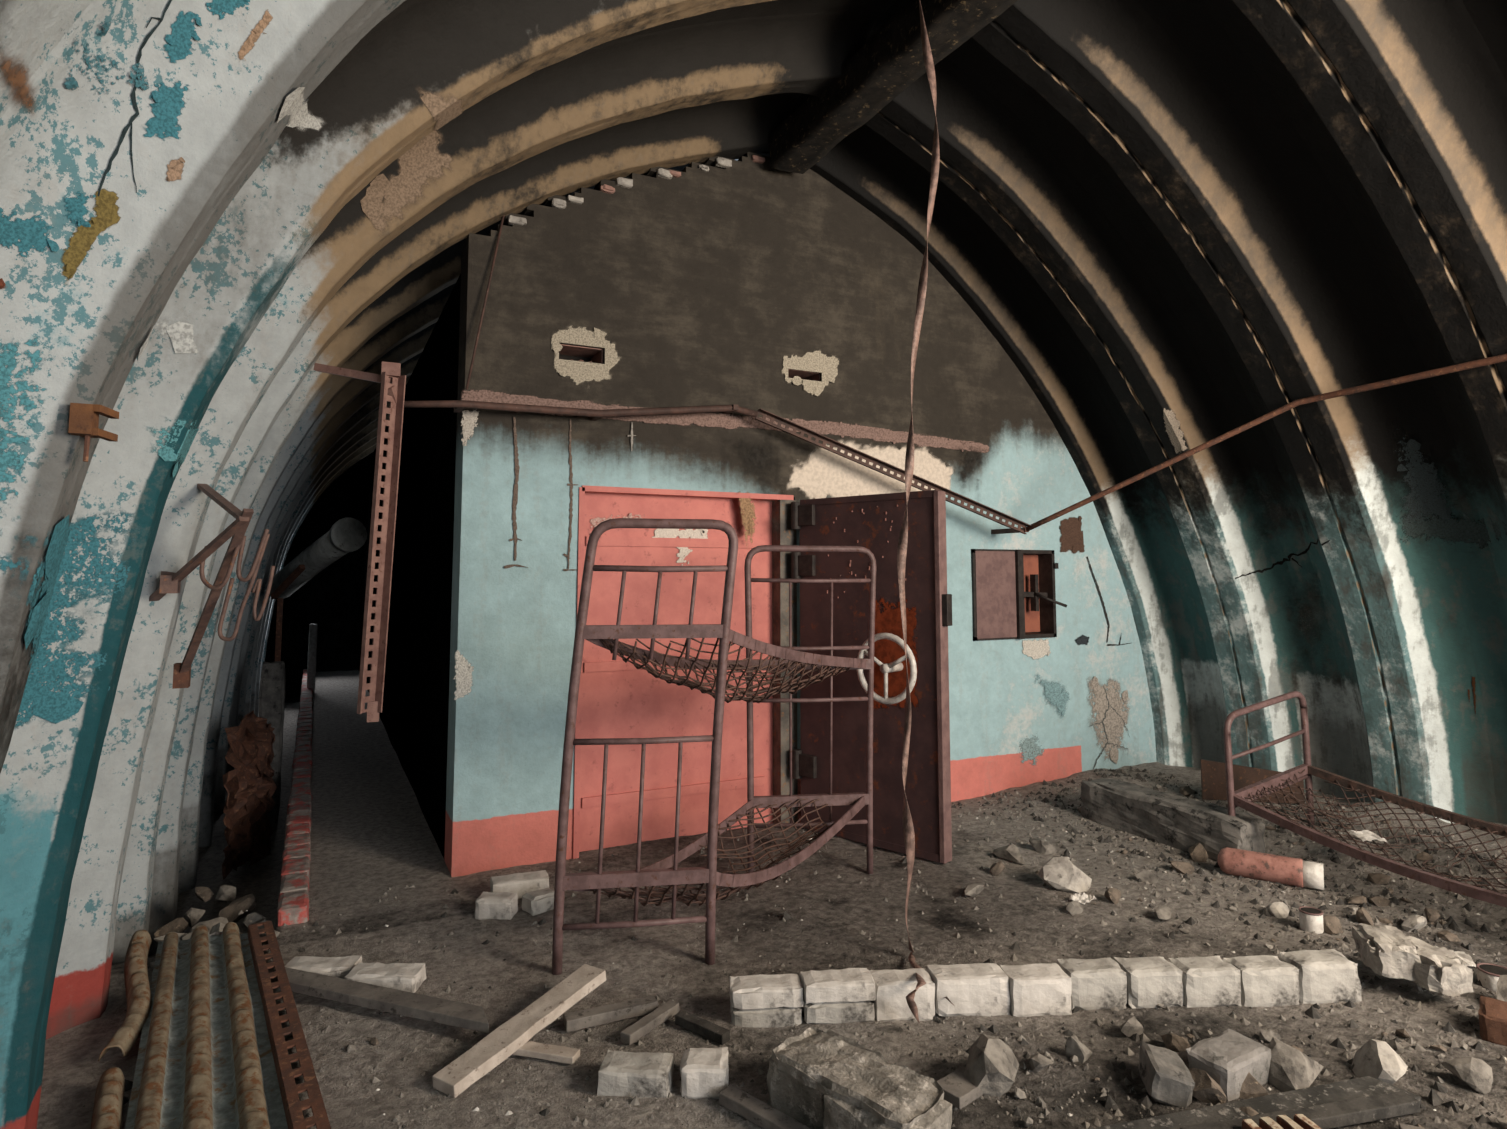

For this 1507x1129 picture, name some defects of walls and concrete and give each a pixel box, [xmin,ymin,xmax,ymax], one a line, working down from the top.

peeling [61,21,189,141]
crack [98,0,172,196]
peeling [164,0,273,63]
flaking render [360,92,467,231]
flaking render [0,189,121,280]
peeling [0,338,46,512]
flaking render [551,326,620,385]
flaking render [782,351,839,396]
flaking render [788,422,953,598]
peeling [0,512,132,728]
rust [873,598,918,711]
flaking render [1089,676,1130,764]